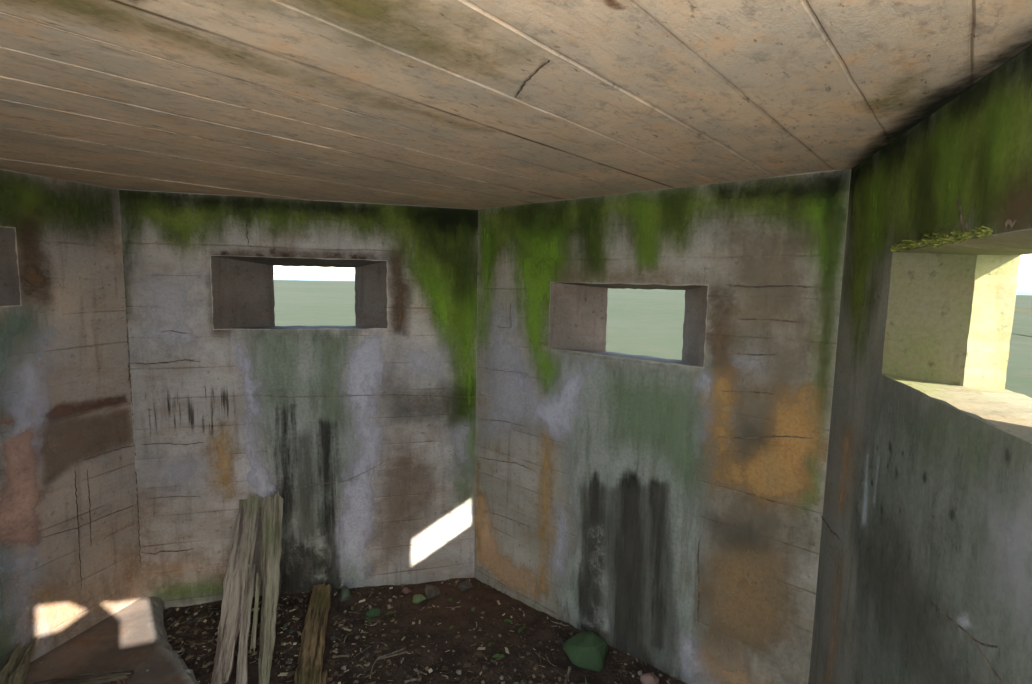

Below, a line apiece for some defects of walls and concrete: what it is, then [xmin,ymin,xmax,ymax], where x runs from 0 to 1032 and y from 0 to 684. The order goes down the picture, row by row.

crack [515,60,550,98]
leakage [720,135,908,326]
leakage [237,330,424,595]
leakage [392,199,801,683]
crack [929,600,1005,684]